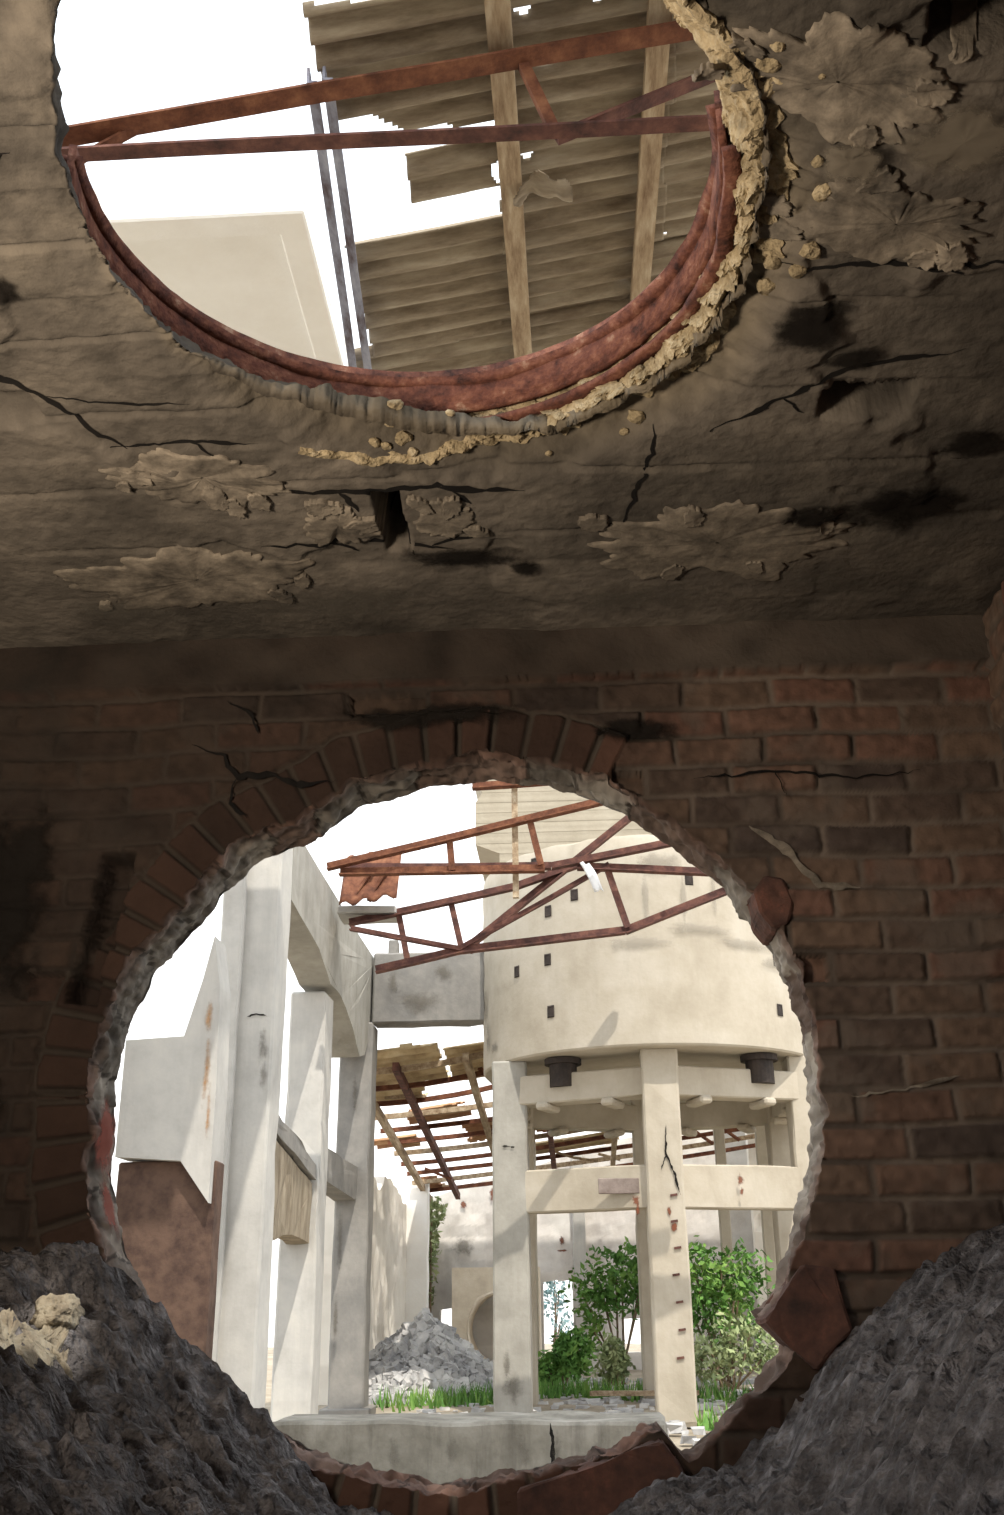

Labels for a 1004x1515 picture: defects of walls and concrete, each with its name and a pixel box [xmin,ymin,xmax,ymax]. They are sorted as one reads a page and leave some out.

spalling [298,0,991,467]
crack [0,375,247,456]
crack [710,348,966,432]
crack [623,427,656,522]
peeling [577,499,854,582]
crack [661,1127,681,1195]